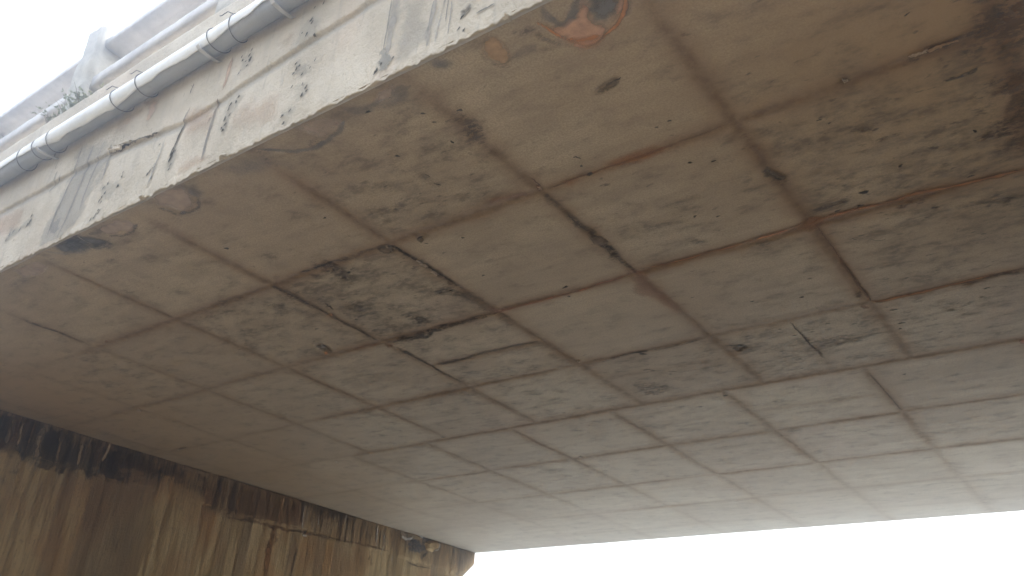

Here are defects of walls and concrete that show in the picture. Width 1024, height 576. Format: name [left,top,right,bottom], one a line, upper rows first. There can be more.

rust [515,0,628,49]
leakage [398,315,487,341]